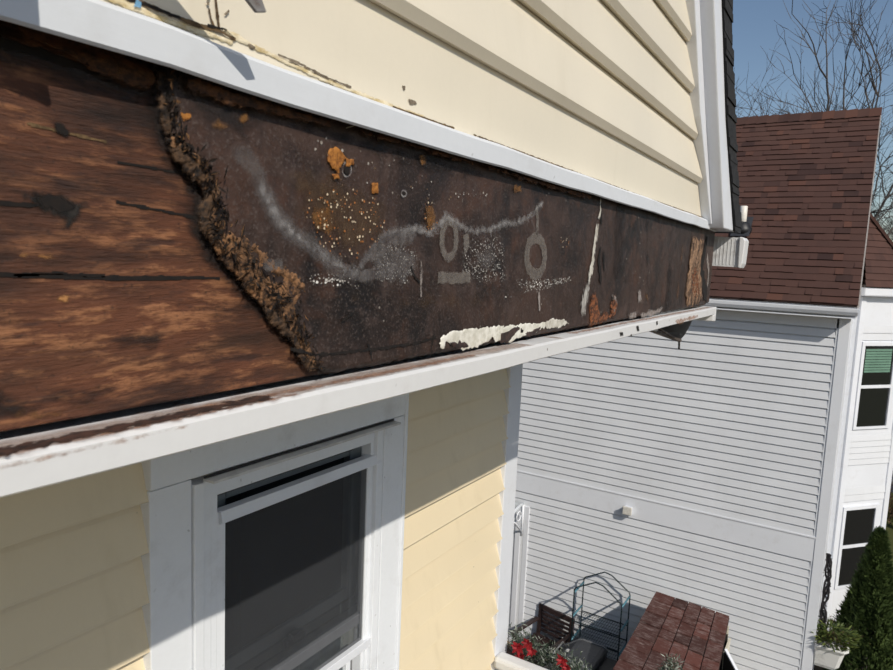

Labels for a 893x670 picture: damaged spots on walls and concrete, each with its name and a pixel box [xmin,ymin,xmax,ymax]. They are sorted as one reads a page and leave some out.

crack [0,200,40,208]
peeling [155,65,326,375]
corrosion [307,147,385,259]
crack [0,271,220,281]
peeling [439,318,569,351]